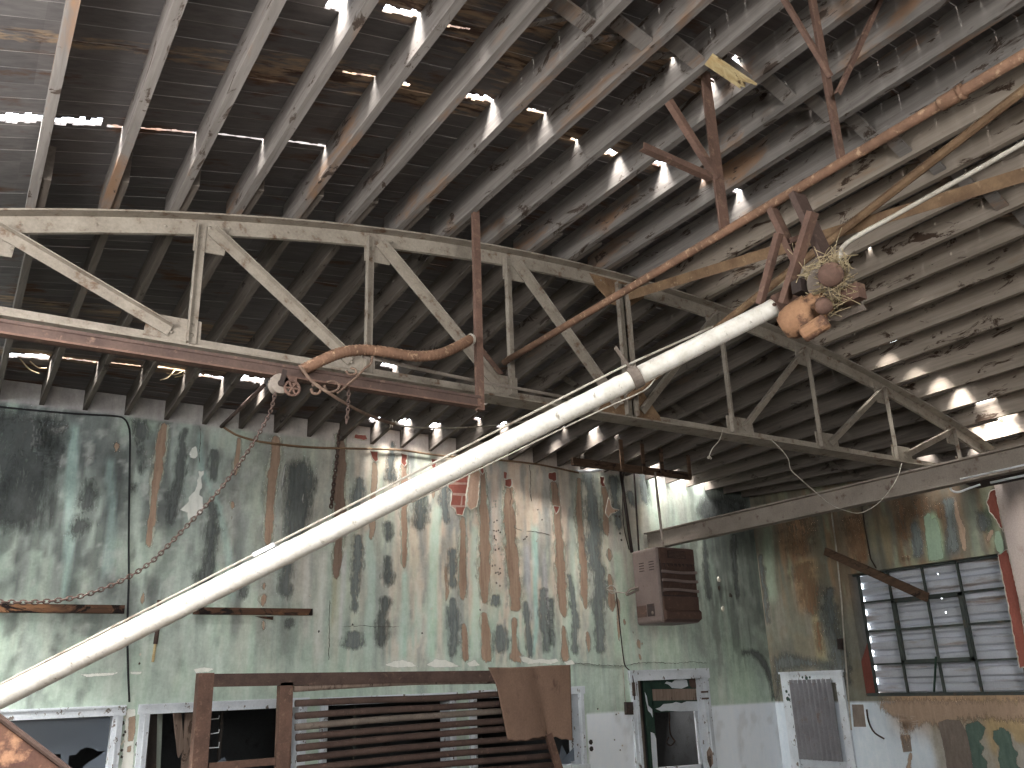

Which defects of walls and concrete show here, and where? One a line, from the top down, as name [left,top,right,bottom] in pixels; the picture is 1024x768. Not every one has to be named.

water stain [0,411,69,531]
water stain [71,477,98,537]
peeling [180,471,204,521]
water stain [349,477,365,510]
flaking render [448,465,485,516]
water stain [350,535,364,612]
water stain [344,556,396,650]
water stain [523,588,555,658]
water stain [567,575,580,654]
flaking render [986,489,1024,668]
peeling [901,735,912,752]
peeling [965,720,1020,768]